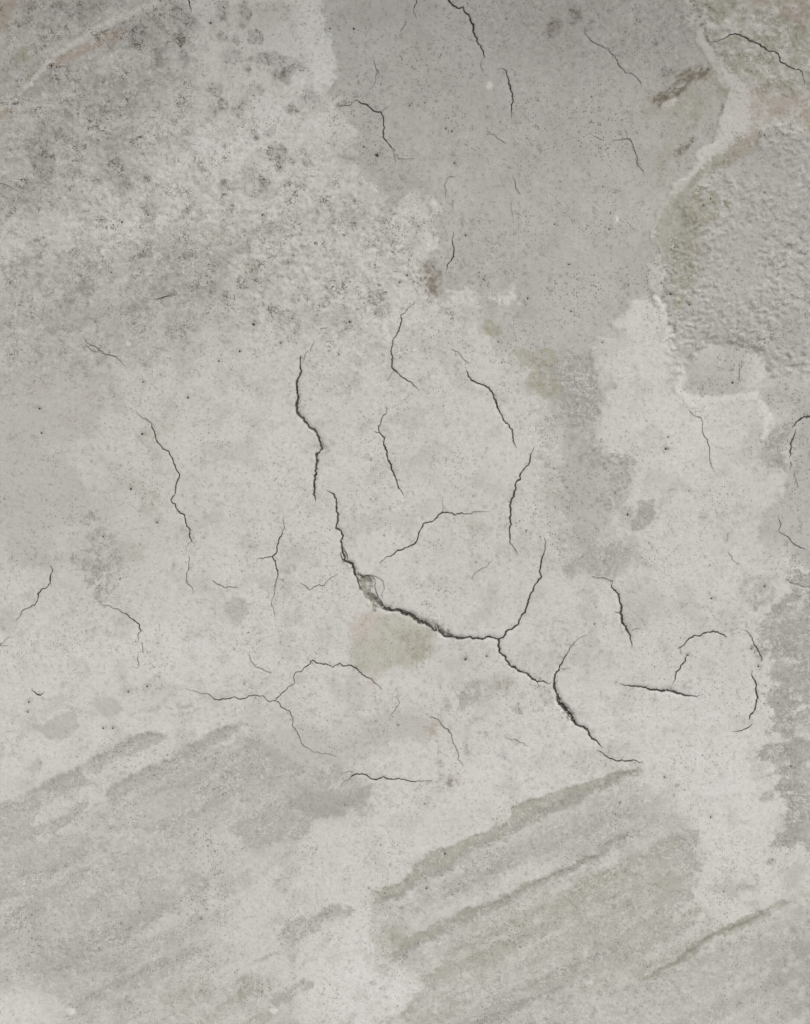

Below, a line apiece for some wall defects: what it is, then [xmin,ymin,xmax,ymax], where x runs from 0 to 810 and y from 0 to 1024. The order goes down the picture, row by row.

crack [448,0,514,144]
crack [713,33,805,85]
crack [386,296,430,387]
crack [136,411,231,588]
crack [295,328,640,763]
damp [0,722,249,851]
crack [192,659,433,788]
damp [286,784,379,820]
crack [622,630,763,732]
damp [31,870,212,1020]
damp [252,903,355,1002]
damp [347,765,810,1024]